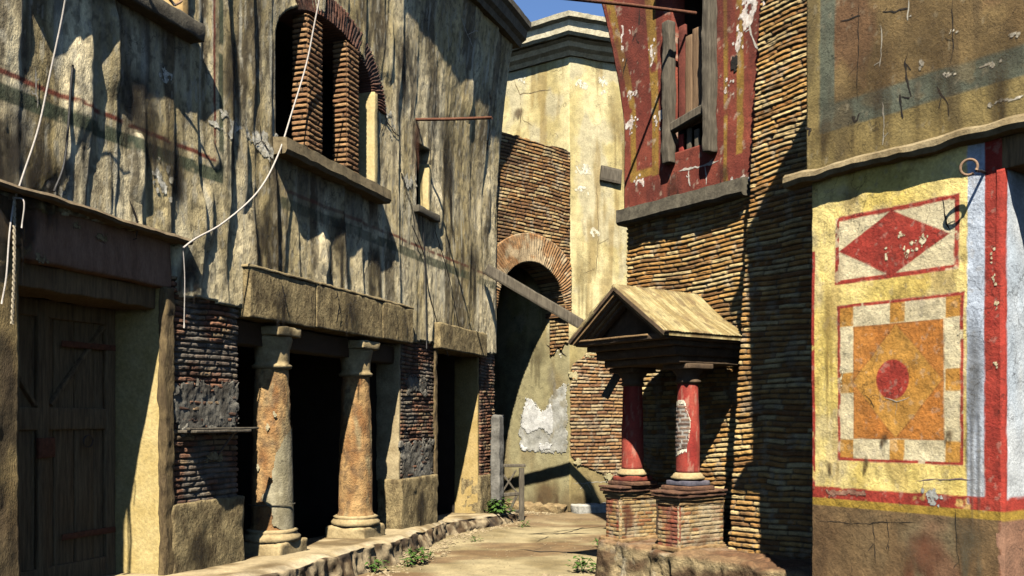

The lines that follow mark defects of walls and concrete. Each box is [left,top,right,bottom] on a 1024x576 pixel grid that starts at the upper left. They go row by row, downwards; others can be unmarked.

peeling [732,0,765,53]
crack [842,2,908,122]
crack [899,53,911,118]
leakage [124,80,183,197]
leakage [179,257,199,300]
leakage [257,209,273,268]
leakage [331,221,348,288]
peeling [898,231,928,259]
spalling [518,352,623,481]
spalling [675,400,691,456]
peeling [921,488,943,508]
crack [819,519,907,563]